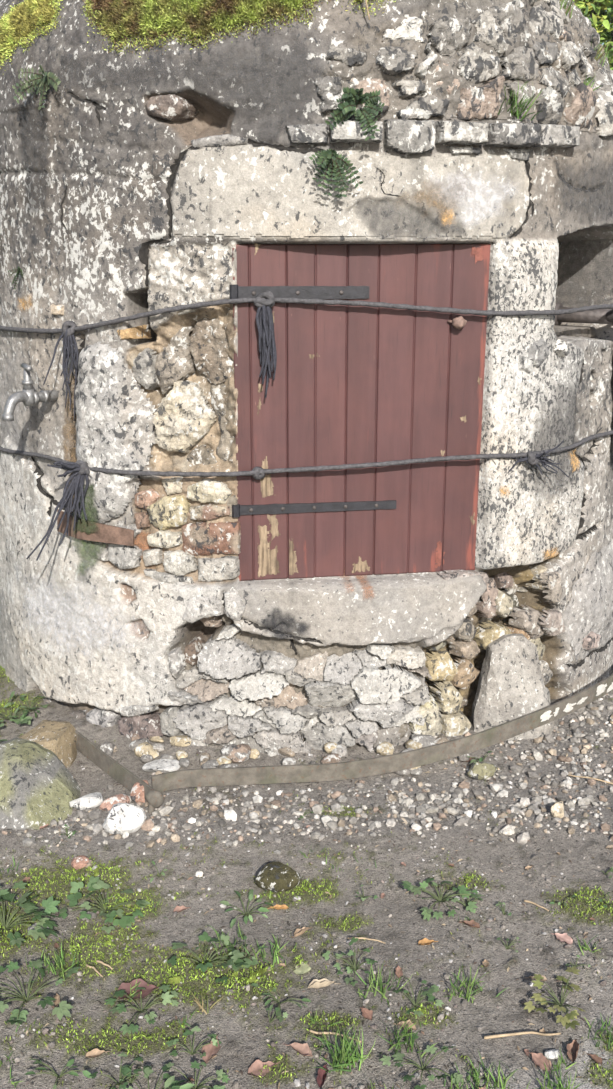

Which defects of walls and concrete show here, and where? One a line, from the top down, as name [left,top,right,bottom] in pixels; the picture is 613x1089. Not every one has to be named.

crack [138,146,200,287]
crack [247,139,324,154]
crack [510,161,534,238]
crack [556,161,605,192]
spalling [43,300,613,757]
crack [574,439,599,540]